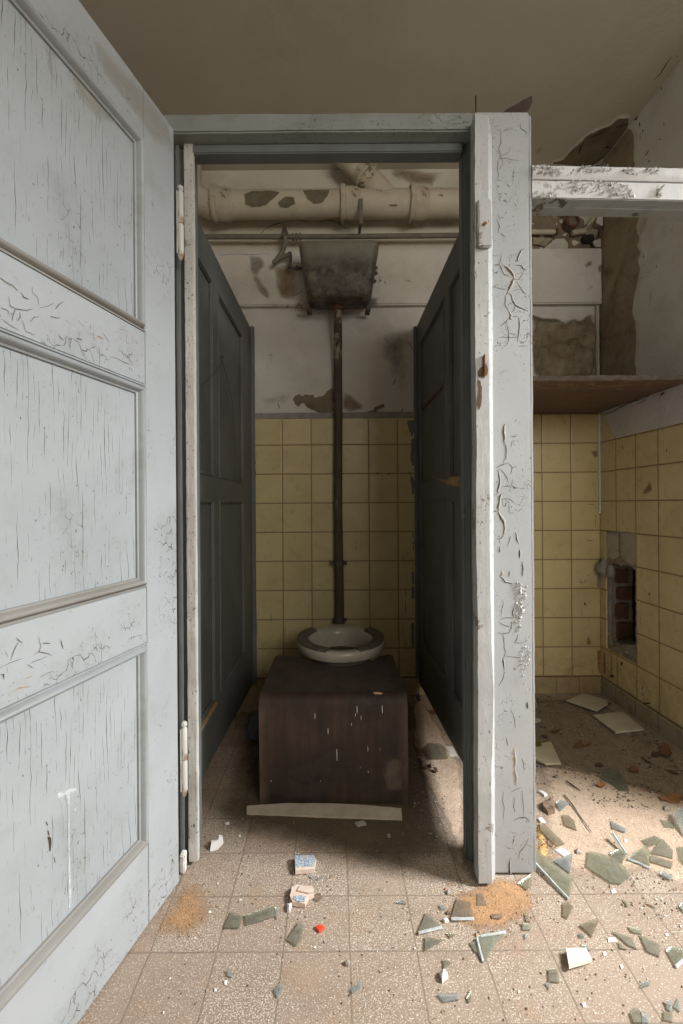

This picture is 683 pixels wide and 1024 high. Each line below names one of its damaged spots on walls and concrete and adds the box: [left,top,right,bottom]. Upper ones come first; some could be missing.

flaking render [532,114,665,199]
crack [1,278,133,364]
crack [495,217,528,346]
flaking render [532,215,648,375]
flaking render [292,387,334,413]
crack [1,639,63,691]
crack [496,421,523,685]
spalling [580,531,650,678]
crack [502,702,530,875]